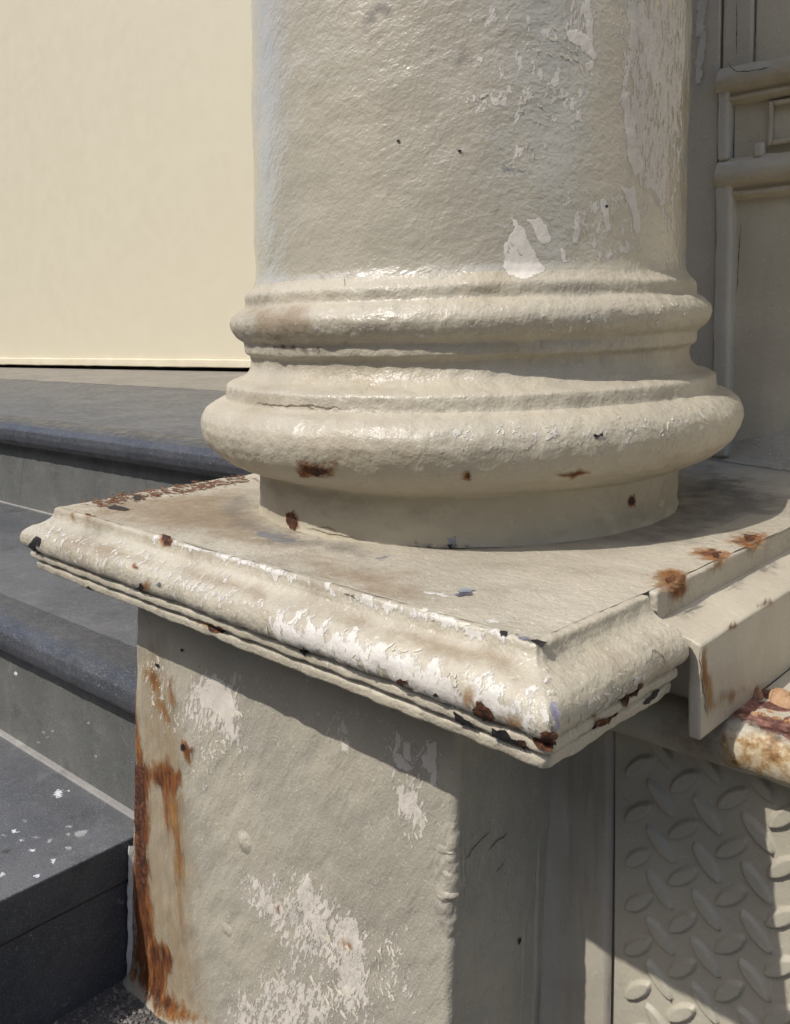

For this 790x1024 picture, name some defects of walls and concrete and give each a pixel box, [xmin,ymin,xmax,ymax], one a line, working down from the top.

peeling [503,0,686,279]
corrosion [71,475,259,518]
peeling [286,511,300,531]
peeling [28,520,561,753]
corrosion [297,461,335,478]
corrosion [656,569,688,600]
corrosion [691,534,766,571]
corrosion [130,656,196,1022]
peeling [174,663,257,803]
peeling [377,731,440,861]
corrosion [715,685,790,784]
peeling [223,856,444,1024]